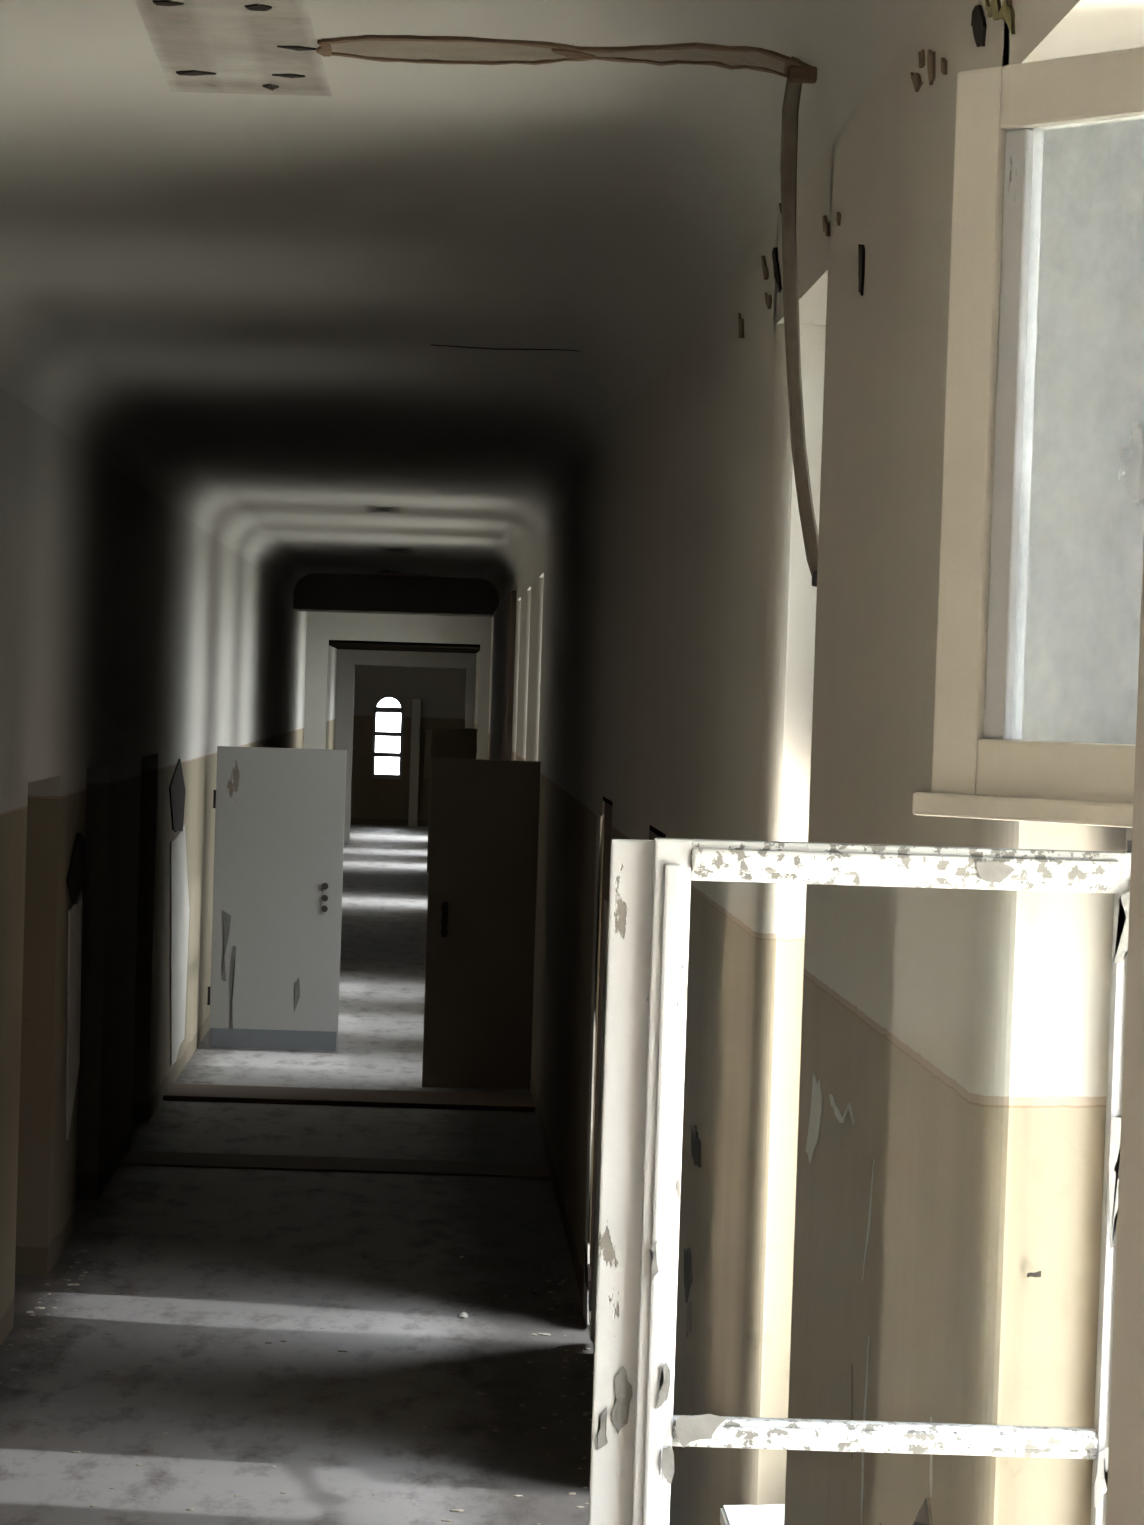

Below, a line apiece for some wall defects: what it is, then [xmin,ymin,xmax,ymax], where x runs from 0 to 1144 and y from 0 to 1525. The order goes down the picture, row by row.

spalling [971,0,1015,47]
spalling [910,50,947,92]
peeling [761,247,782,309]